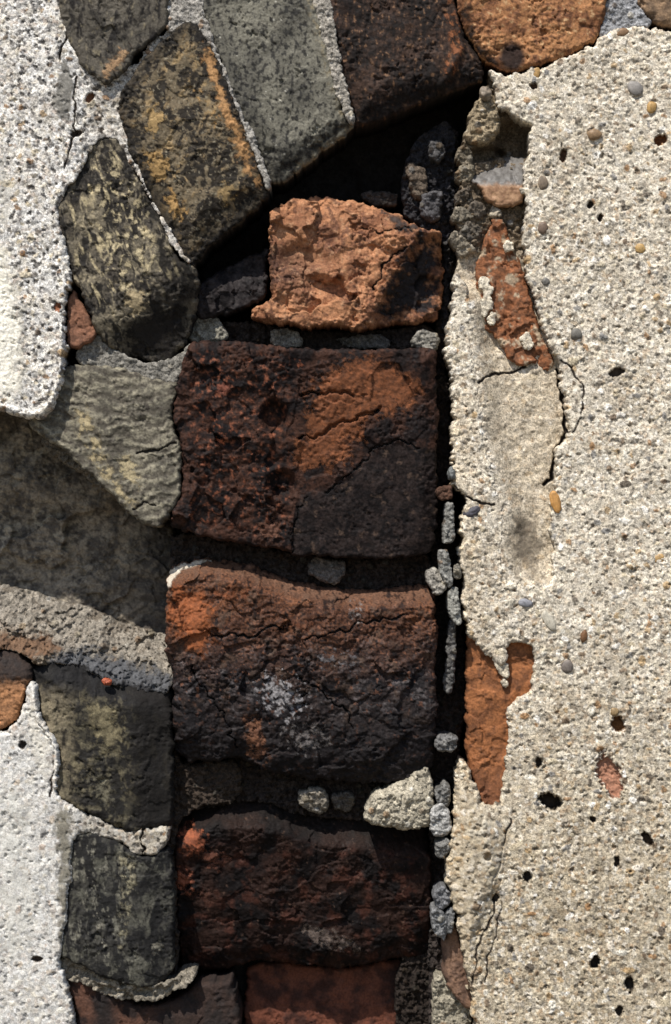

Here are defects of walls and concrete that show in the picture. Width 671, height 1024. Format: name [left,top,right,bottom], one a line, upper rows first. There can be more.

crack [59,35,78,169]
crack [478,366,526,384]
spalling [447,77,568,591]
crack [542,360,585,486]
crack [169,128,495,1024]
spalling [463,634,534,805]
spalling [595,750,623,798]
crack [471,901,502,985]